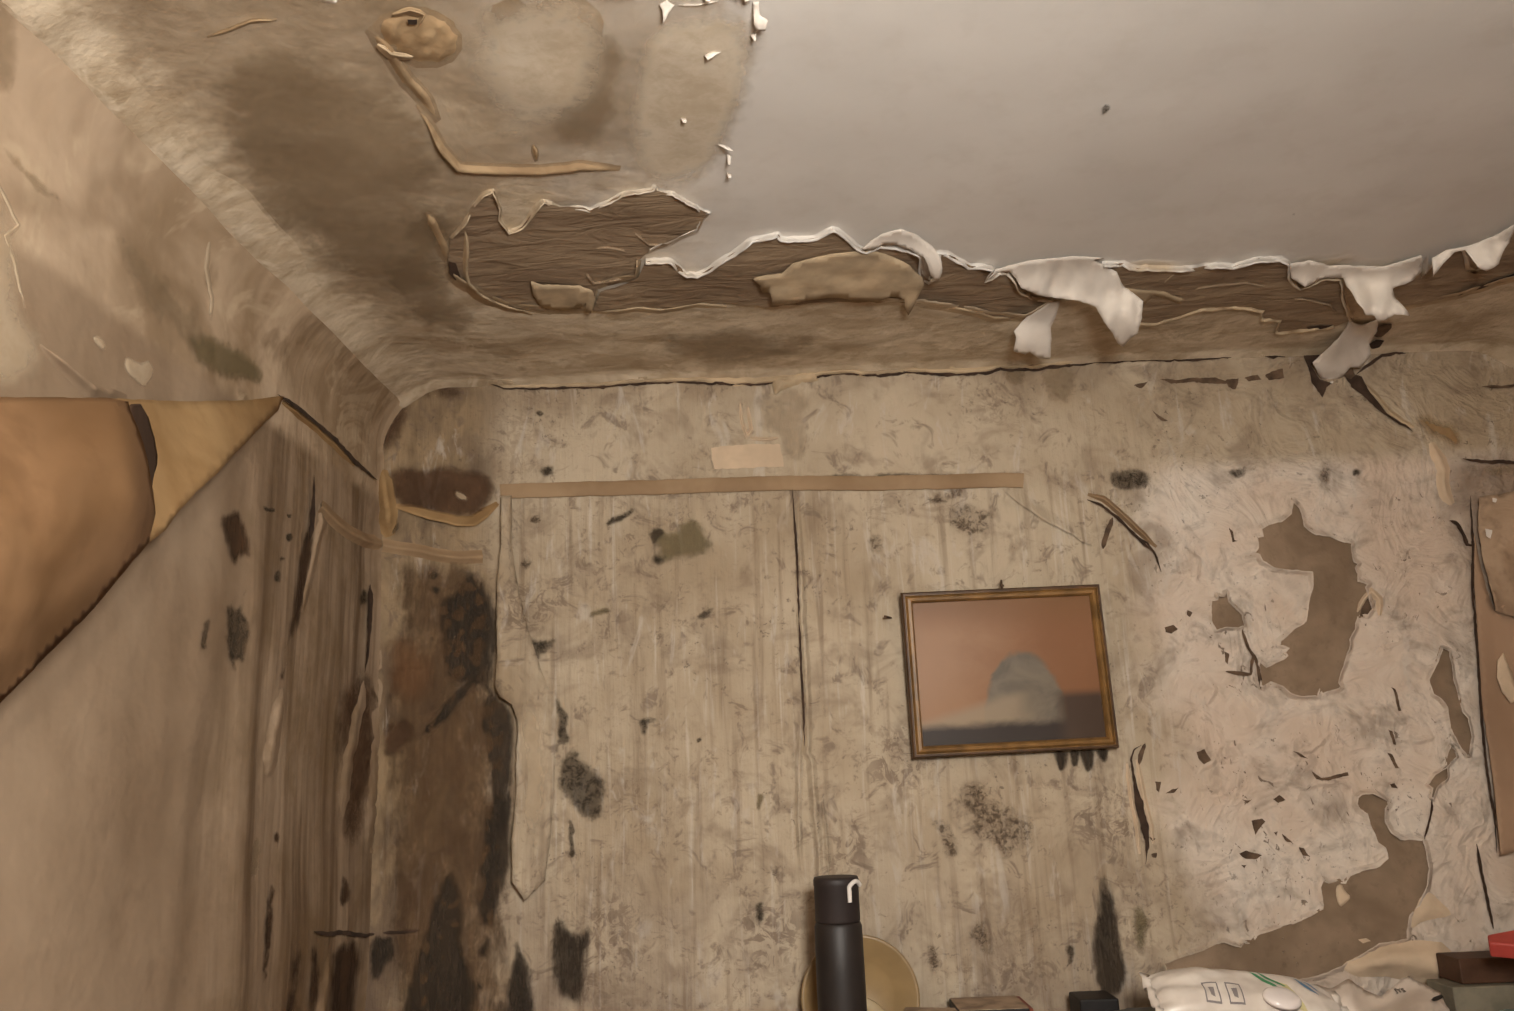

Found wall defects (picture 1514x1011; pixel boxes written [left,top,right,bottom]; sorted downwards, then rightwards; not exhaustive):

damp [636,20,745,179]
peeling [745,0,768,41]
peeling [444,183,1514,397]
peeling [0,396,284,703]
mould [223,512,248,562]
mould [227,608,249,664]
peeling [1087,493,1161,571]
peeling [1207,497,1383,701]
damp [287,570,533,1011]
peeling [1158,534,1514,983]
damp [263,891,274,976]
damp [553,923,589,1000]